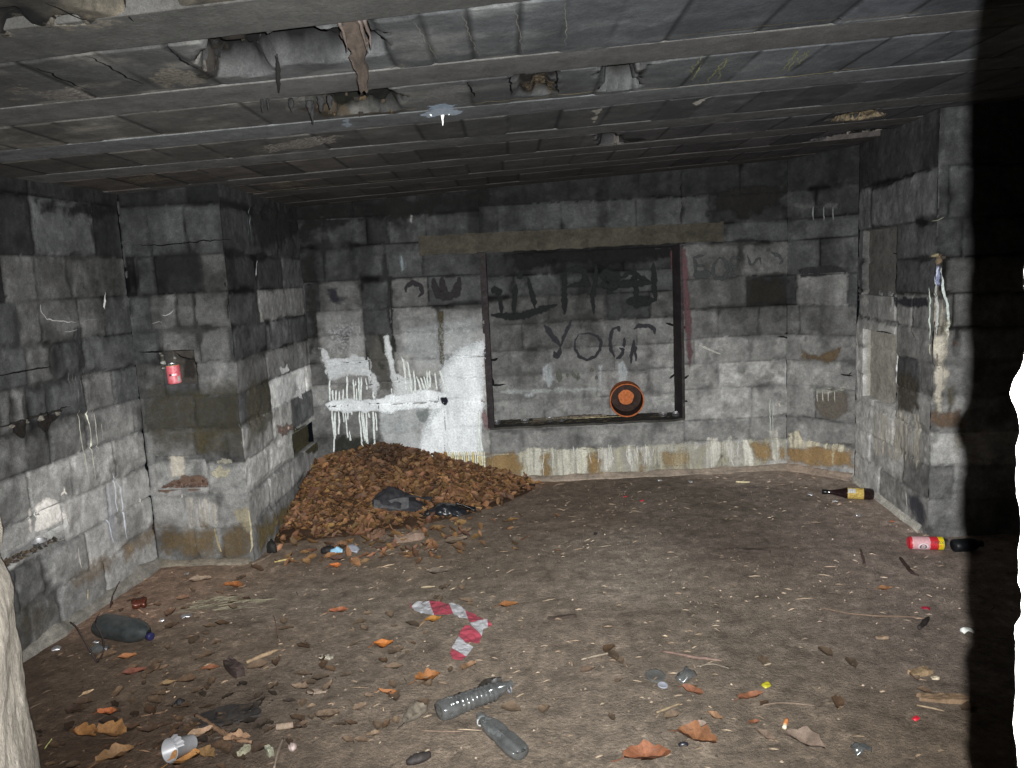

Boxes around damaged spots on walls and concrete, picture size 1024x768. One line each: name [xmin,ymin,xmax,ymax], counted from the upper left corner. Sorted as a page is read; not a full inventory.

spalling [197,32,261,80]
spalling [831,109,885,135]
water stain [500,398,849,476]
water stain [237,509,253,552]